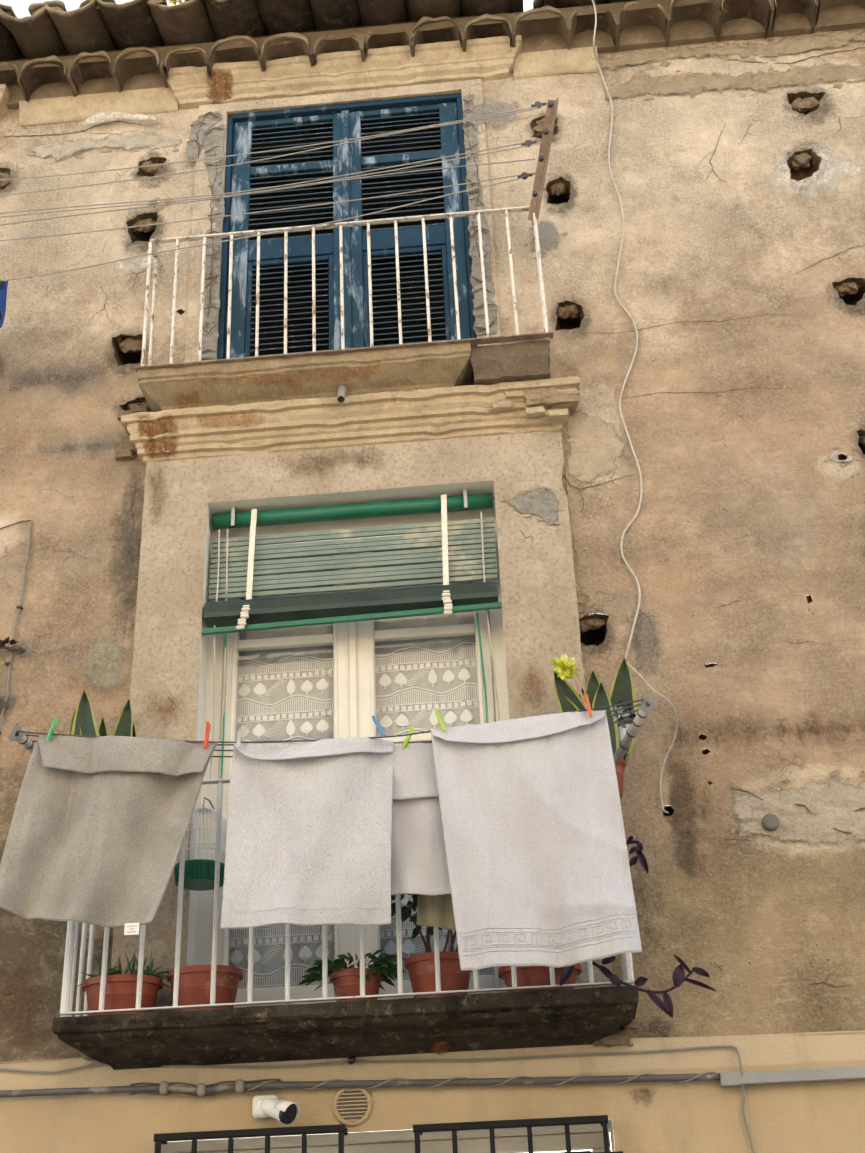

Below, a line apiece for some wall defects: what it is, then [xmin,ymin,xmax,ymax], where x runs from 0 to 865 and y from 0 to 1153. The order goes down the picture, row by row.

crack [697,123,754,183]
spalling [26,111,226,361]
spalling [111,334,143,366]
corrosion [138,416,177,458]
flaking render [501,487,562,525]
crack [563,471,636,559]
flaking render [722,769,865,853]